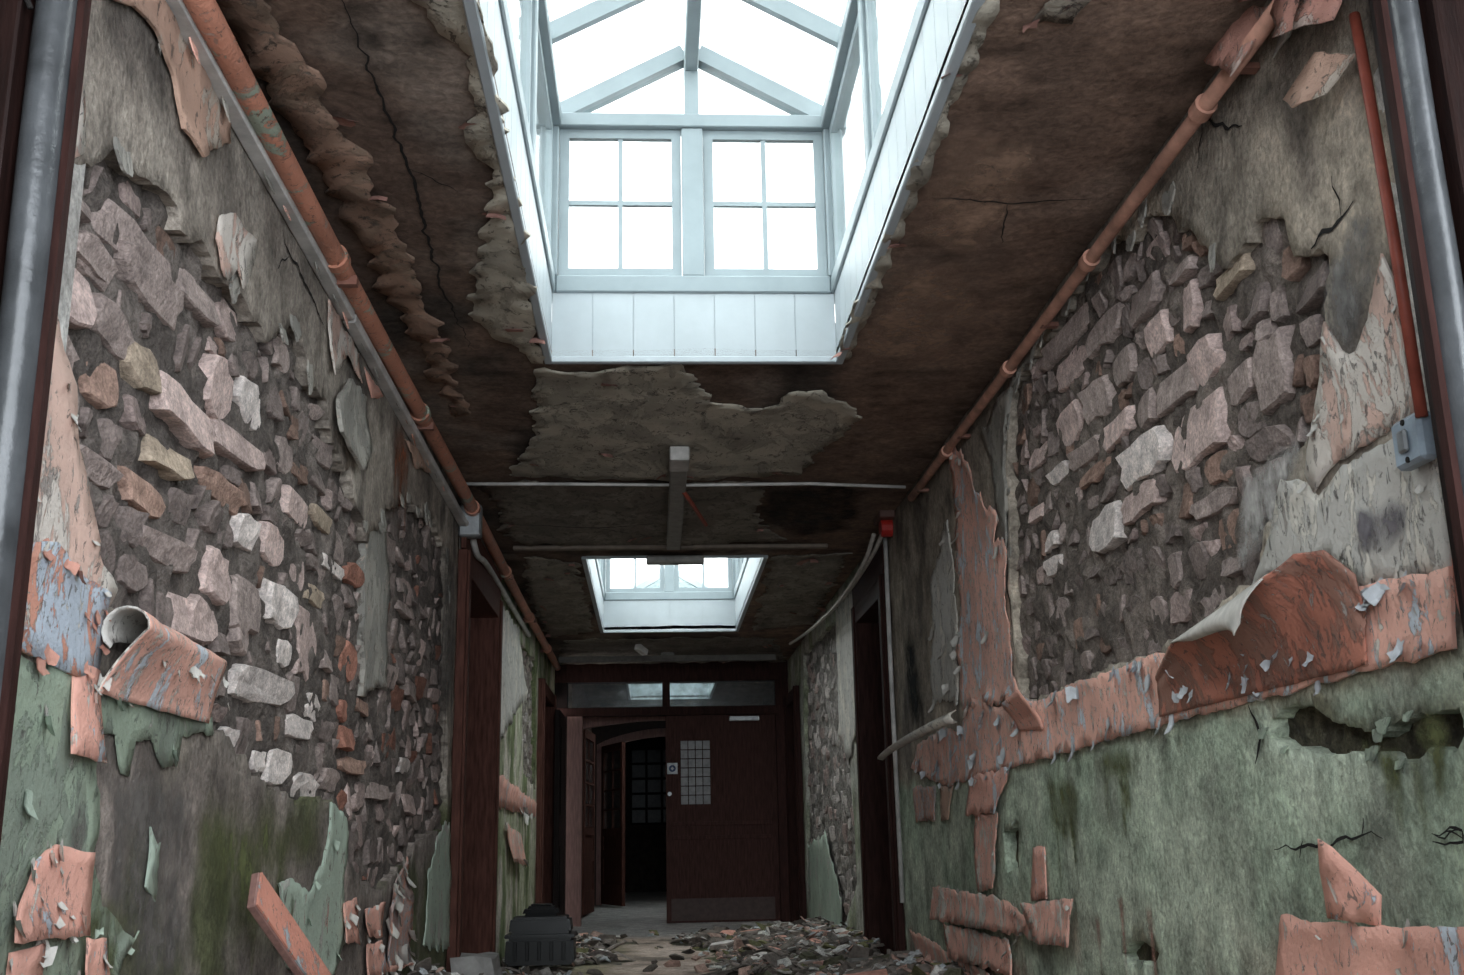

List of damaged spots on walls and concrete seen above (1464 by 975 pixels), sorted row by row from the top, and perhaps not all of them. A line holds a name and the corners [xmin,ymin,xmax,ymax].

peeling [114,0,232,157]
peeling [1204,0,1342,77]
peeling [1283,52,1356,108]
peeling [216,0,471,418]
flaking render [0,80,452,975]
peeling [411,0,862,925]
damp [762,487,859,536]
flaking render [909,181,1464,975]
damp [112,781,183,973]